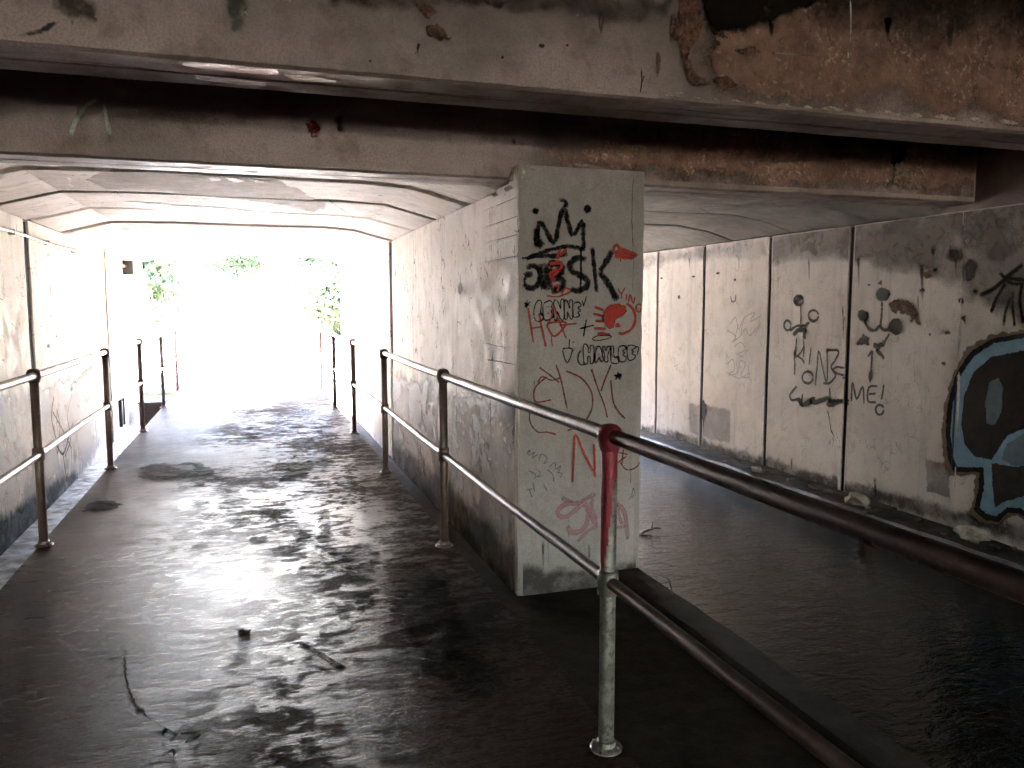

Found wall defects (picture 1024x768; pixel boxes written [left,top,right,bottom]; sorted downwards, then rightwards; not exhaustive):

spalling [416,2,451,41]
spalling [659,0,955,121]
spalling [888,299,921,326]
damp [0,369,124,556]
damp [393,374,597,596]
crack [123,655,209,734]